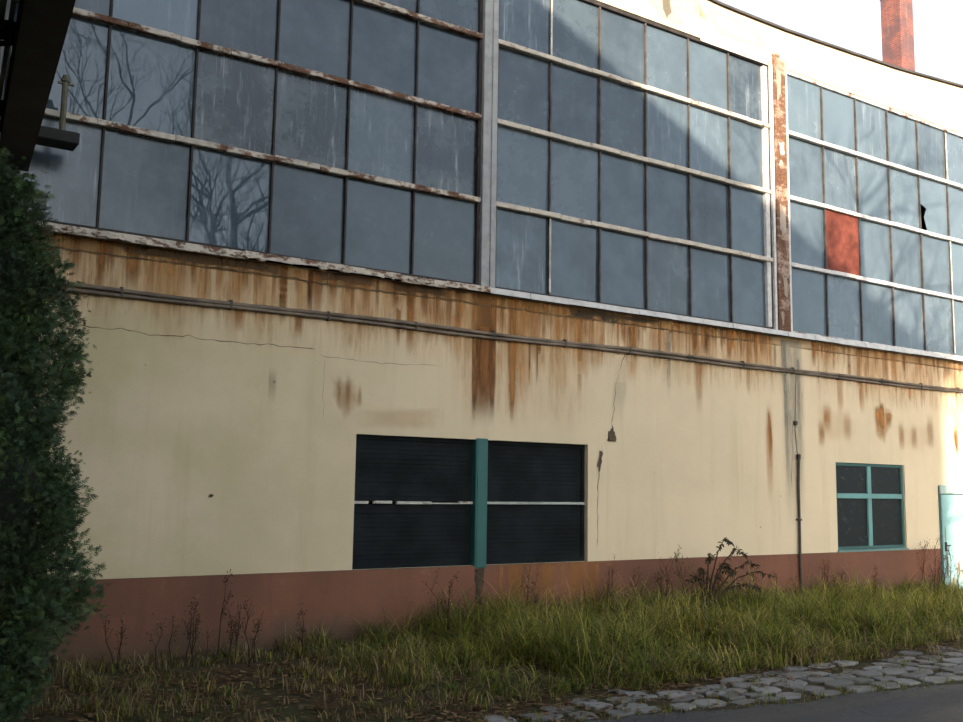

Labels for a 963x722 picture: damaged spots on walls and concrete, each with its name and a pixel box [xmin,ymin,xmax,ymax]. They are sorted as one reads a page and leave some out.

peeling [651,0,699,23]
rust [73,236,114,283]
spalling [57,227,294,274]
rust [273,265,351,307]
spalling [308,263,445,296]
crack [48,246,755,419]
rust [394,283,603,408]
rust [617,314,646,356]
rust [658,319,770,363]
rust [876,406,891,435]